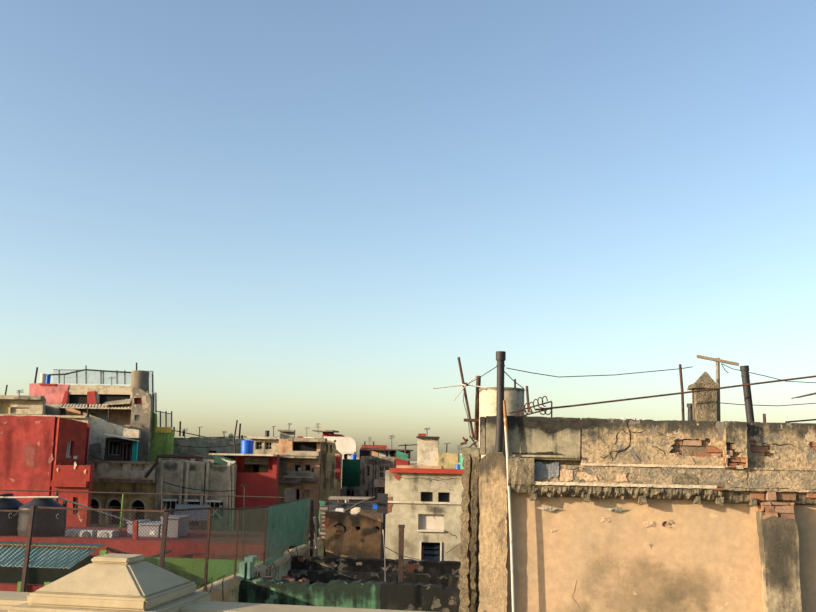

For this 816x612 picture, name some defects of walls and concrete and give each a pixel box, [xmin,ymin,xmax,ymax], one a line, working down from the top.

crack [558,420,675,479]
flaking render [669,438,779,469]
leakage [238,586,267,603]